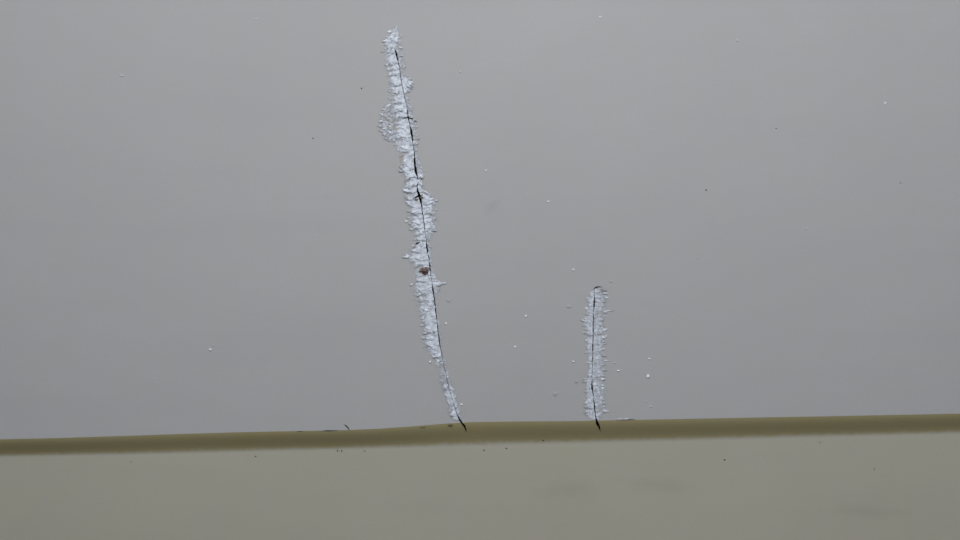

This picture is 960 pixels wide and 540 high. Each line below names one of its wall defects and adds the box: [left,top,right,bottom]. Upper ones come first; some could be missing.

crack [395,50,467,431]
crack [591,286,601,431]